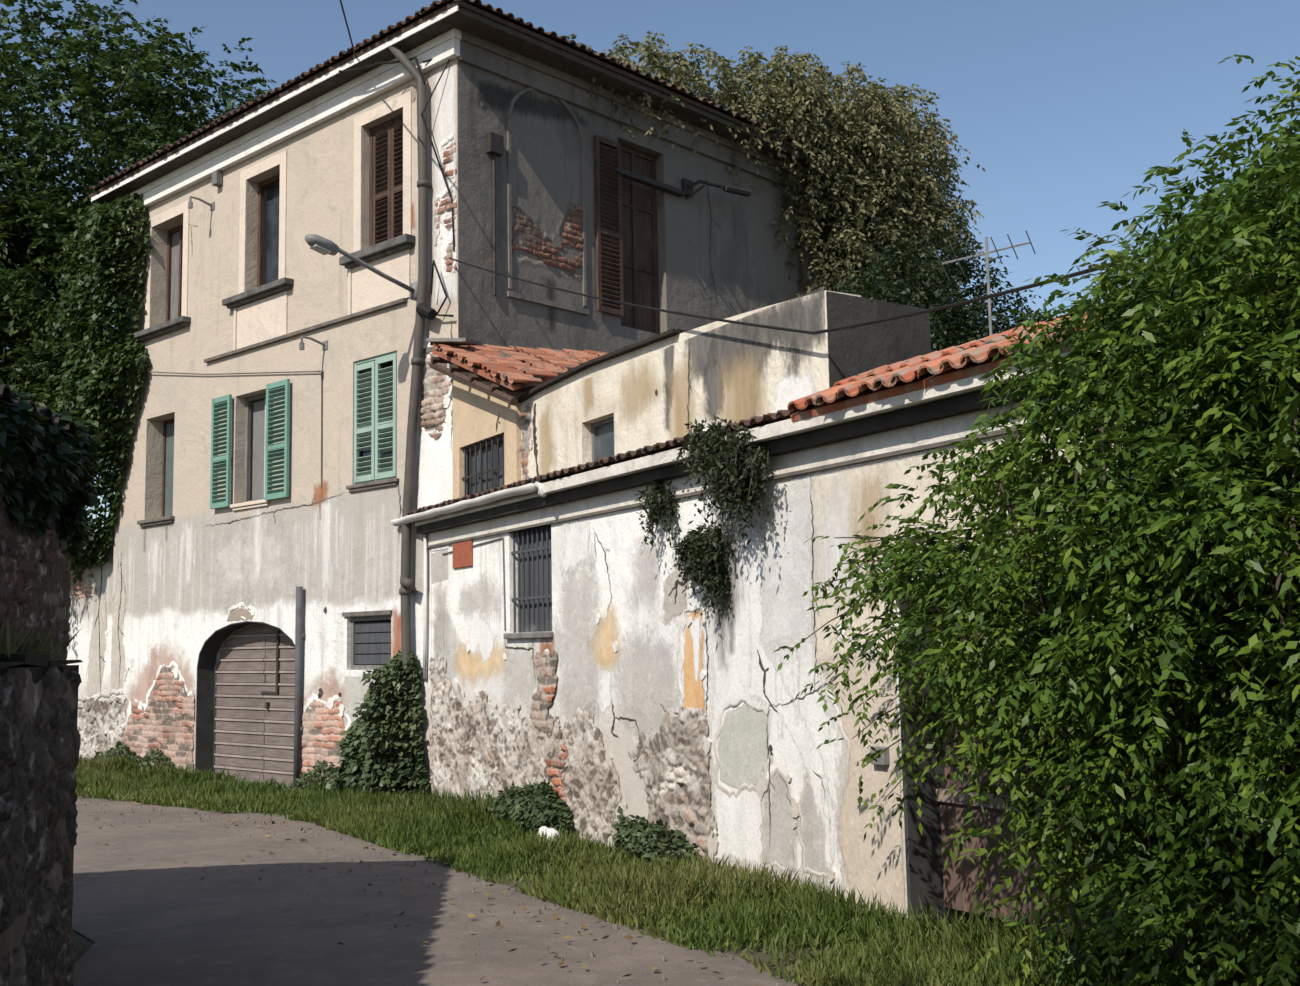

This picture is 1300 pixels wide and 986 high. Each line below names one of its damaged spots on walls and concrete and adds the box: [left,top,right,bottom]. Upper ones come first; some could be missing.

peeling [392,64,457,305]
leakage [623,287,825,437]
leakage [144,520,196,593]
leakage [214,507,296,610]
leakage [314,500,339,591]
flaking render [0,478,195,986]
flaking render [301,676,383,785]
flaking render [429,546,905,921]
crack [757,475,848,847]